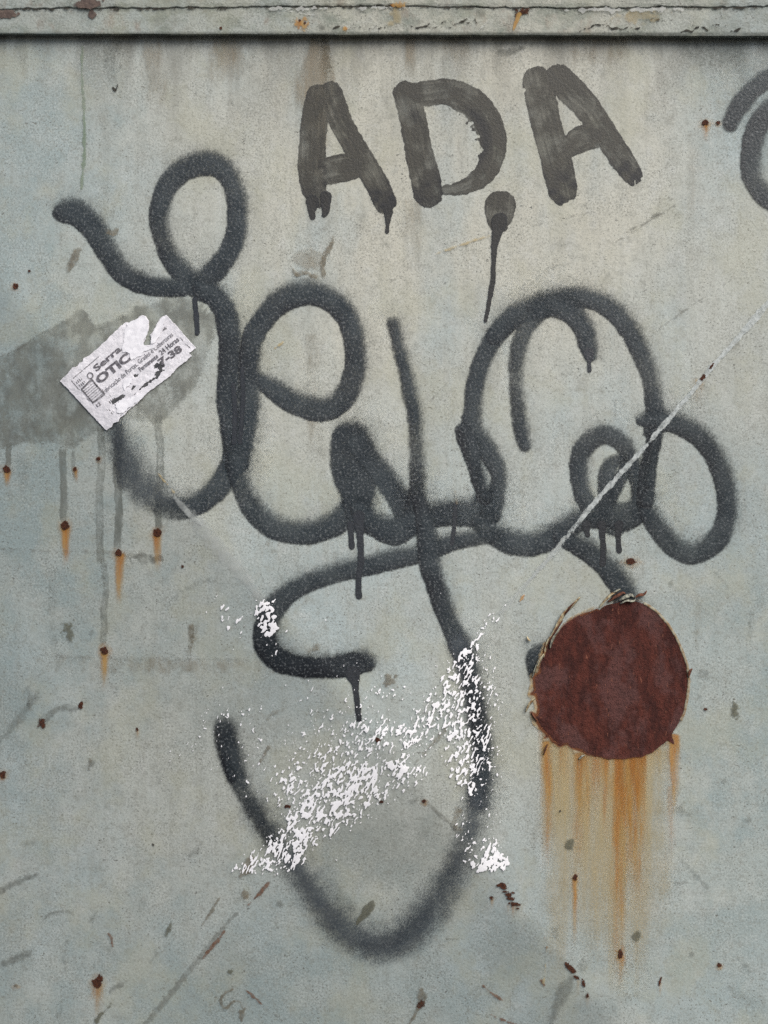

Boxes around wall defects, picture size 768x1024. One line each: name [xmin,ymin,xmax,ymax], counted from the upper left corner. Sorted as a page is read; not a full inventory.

corrosion [60,521,70,553]
corrosion [153,528,162,554]
corrosion [115,549,124,591]
corrosion [100,646,108,674]
corrosion [525,589,692,924]